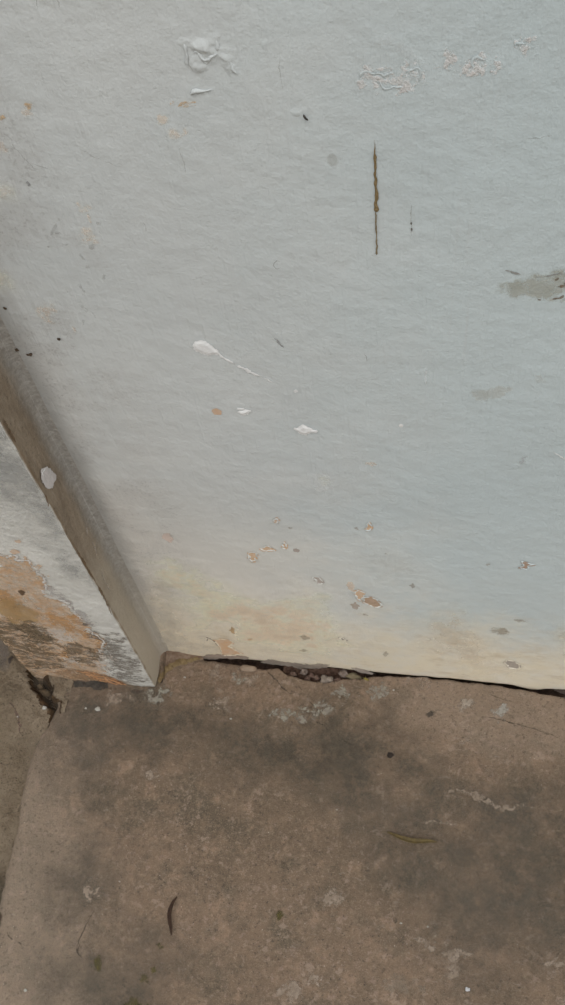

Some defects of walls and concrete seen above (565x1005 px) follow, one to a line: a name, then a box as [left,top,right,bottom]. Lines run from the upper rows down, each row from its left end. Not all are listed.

peeling [41,467,56,506]
peeling [0,540,141,694]
peeling [346,582,383,609]
crack [157,637,323,725]
crack [364,671,565,737]